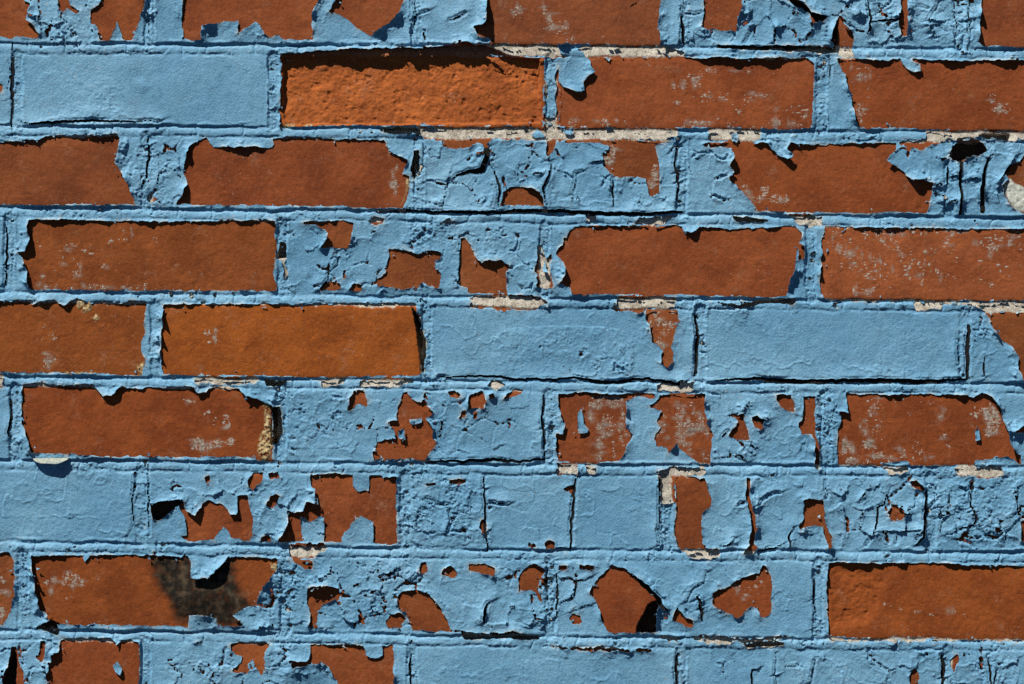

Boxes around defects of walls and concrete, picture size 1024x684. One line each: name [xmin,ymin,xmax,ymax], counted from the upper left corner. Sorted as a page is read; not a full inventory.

peeling [0,0,45,47]
peeling [52,0,150,47]
spalling [176,0,1024,386]
peeling [0,128,442,574]
peeling [445,377,531,425]
peeling [550,375,727,567]
peeling [725,409,770,446]
peeling [25,548,283,684]
peeling [283,471,797,684]